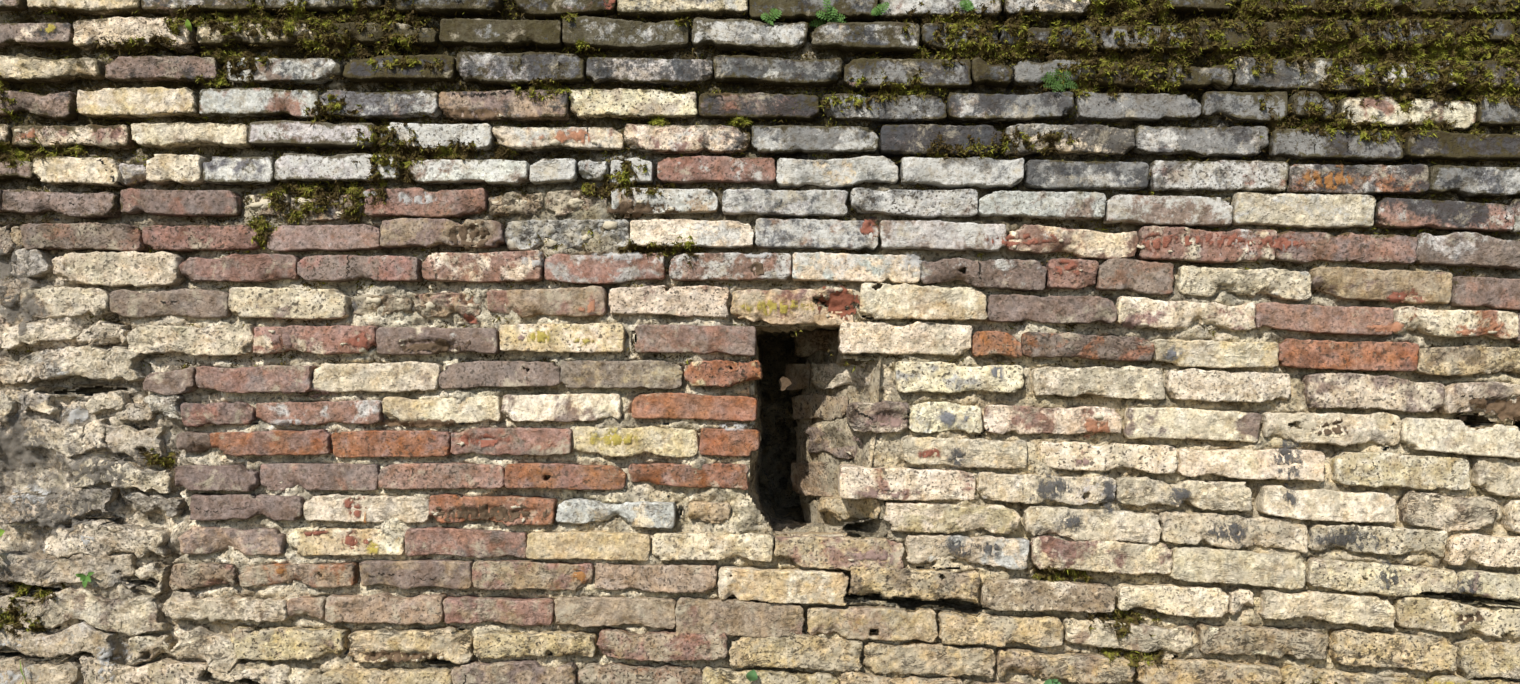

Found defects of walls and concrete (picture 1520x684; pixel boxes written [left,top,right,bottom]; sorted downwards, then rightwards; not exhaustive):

leakage [903,254,920,270]
spalling [779,377,792,391]